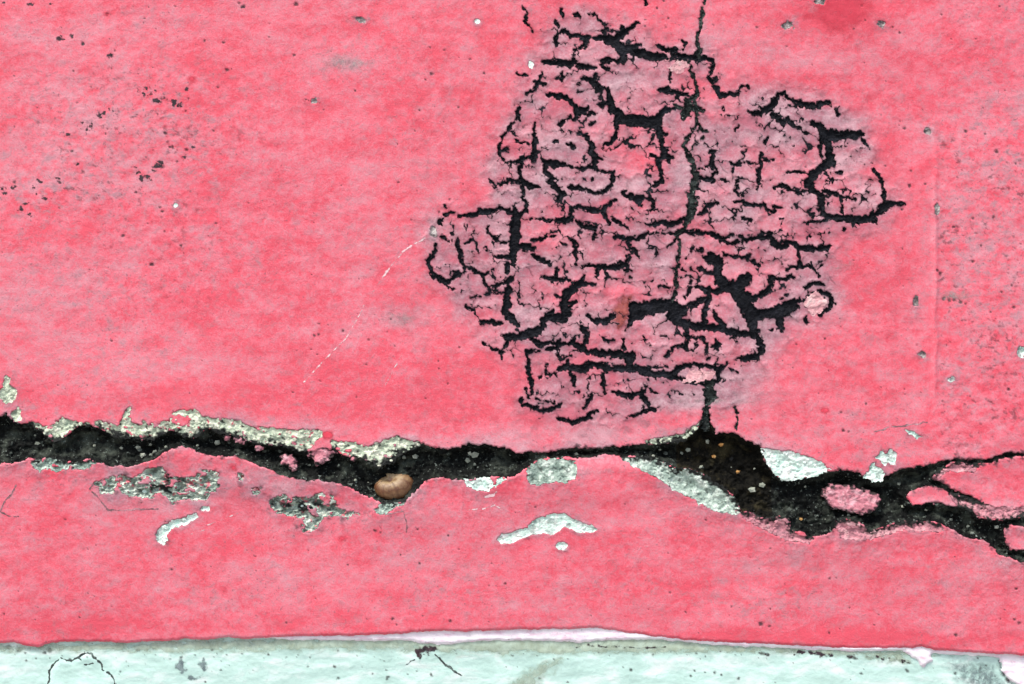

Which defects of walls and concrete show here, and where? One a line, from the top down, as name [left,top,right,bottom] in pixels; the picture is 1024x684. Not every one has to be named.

crack [522,5,543,33]
crack [540,0,837,365]
crack [0,71,1024,562]
spalling [0,375,423,470]
spalling [94,467,220,545]
spalling [238,473,360,532]
spalling [497,513,597,550]
spalling [526,457,577,486]